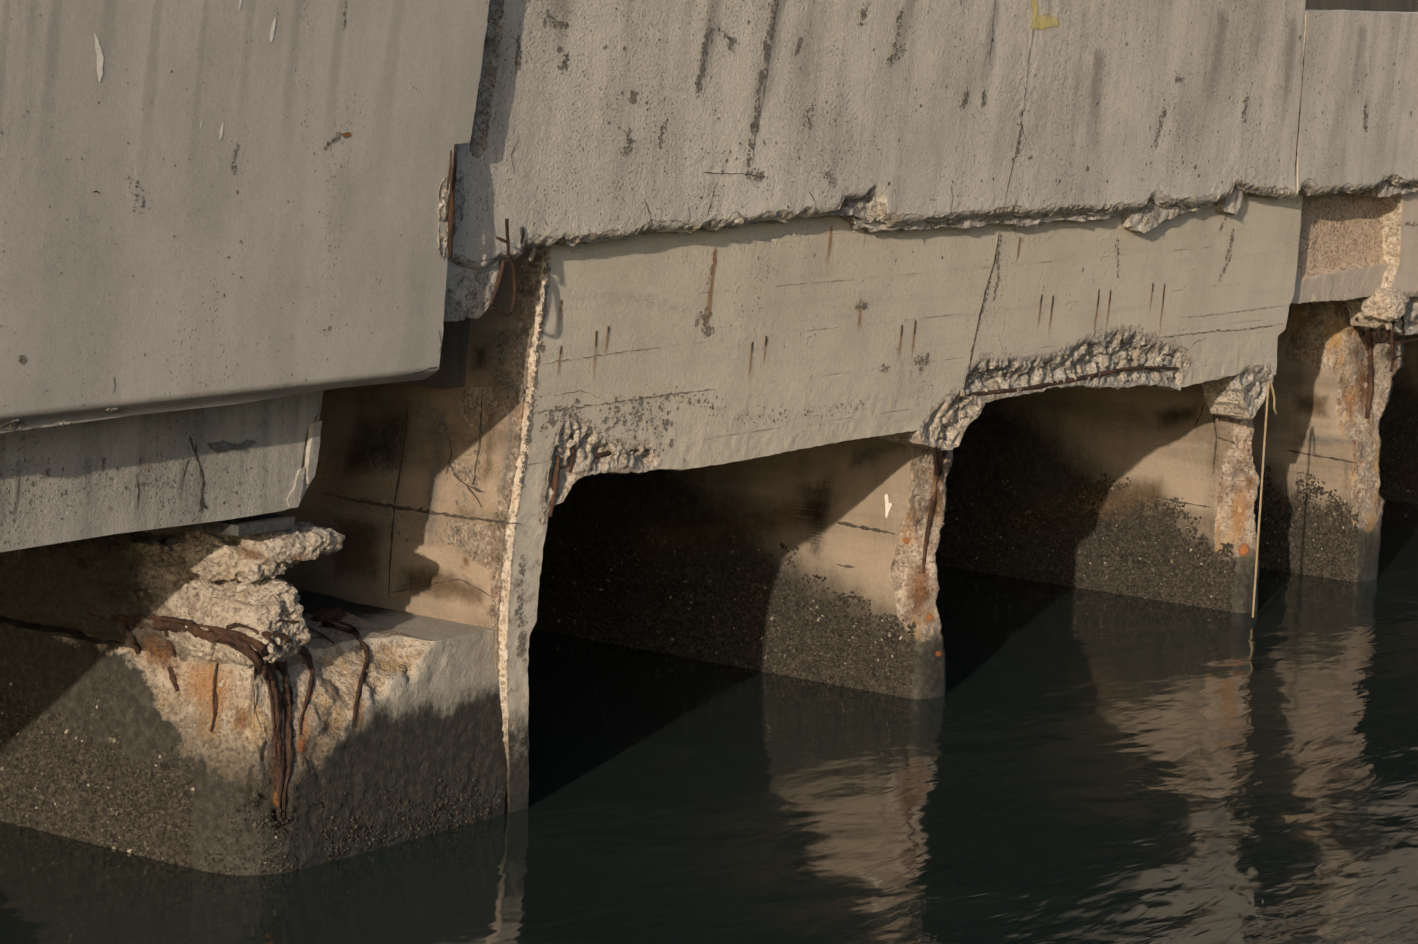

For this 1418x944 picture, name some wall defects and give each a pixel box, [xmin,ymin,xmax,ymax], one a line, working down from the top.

spalling [437,0,1418,316]
crack [969,29,1034,371]
corrosion [708,250,716,317]
spalling [543,416,660,523]
spalling [901,329,1192,574]
spalling [1208,366,1274,420]
spalling [1355,296,1418,419]
corrosion [911,570,933,622]
spalling [85,611,370,824]